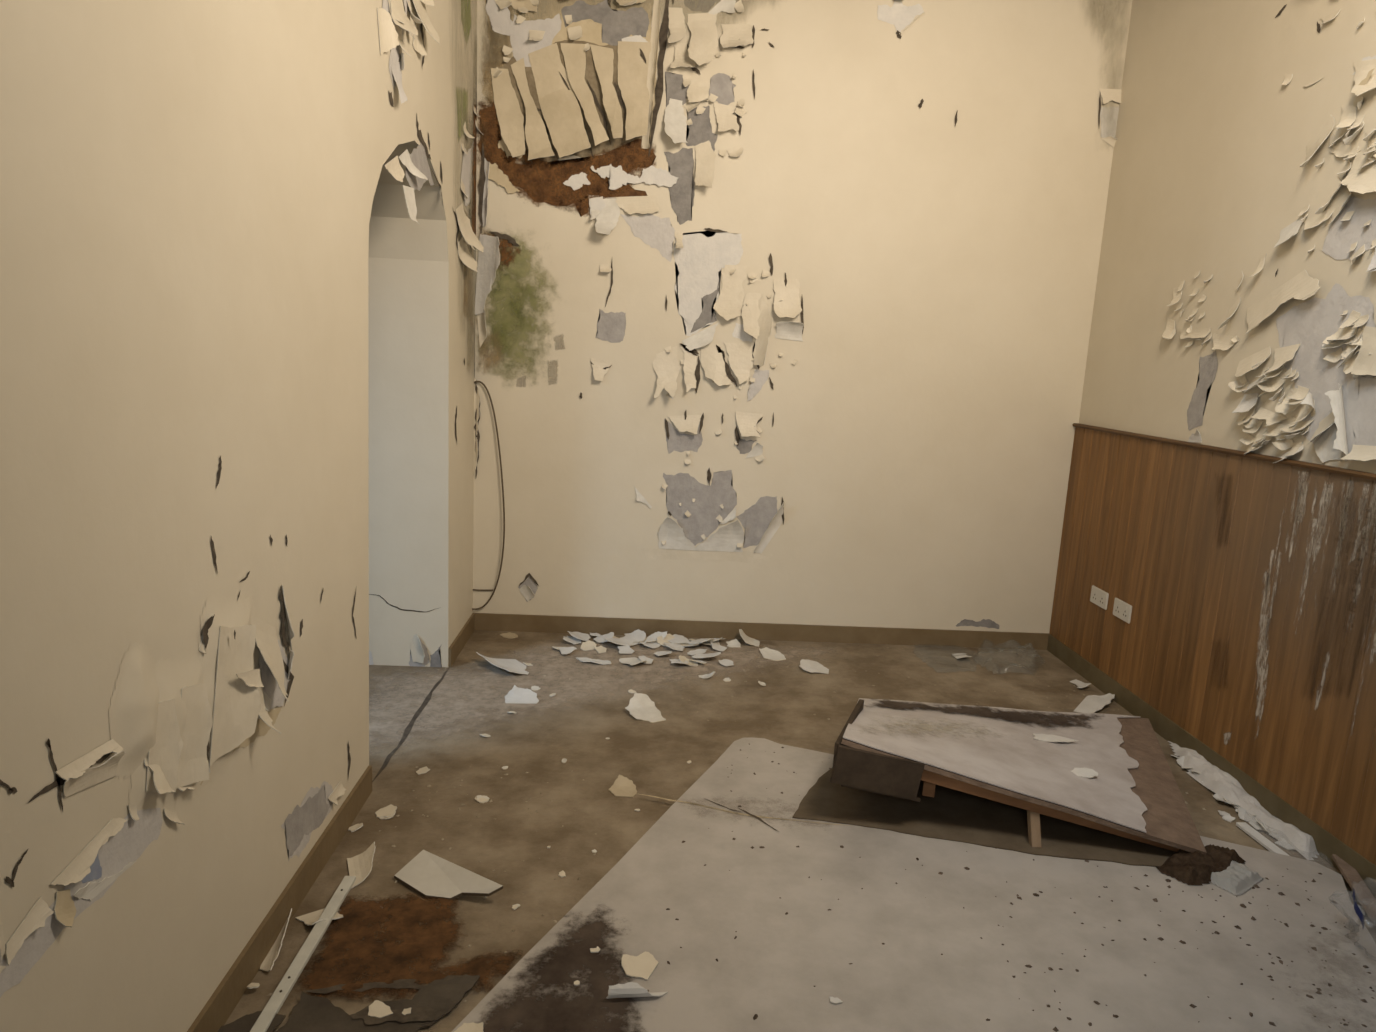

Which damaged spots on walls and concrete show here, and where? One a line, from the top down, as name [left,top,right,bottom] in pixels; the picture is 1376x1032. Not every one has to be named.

water stain [590,0,640,11]
peeling [1317,9,1340,33]
water stain [456,0,565,387]
peeling [377,0,804,563]
peeling [1162,55,1376,463]
water stain [1255,471,1376,736]
peeling [0,805,185,998]
peeling [260,908,292,971]
flaking render [281,781,347,861]